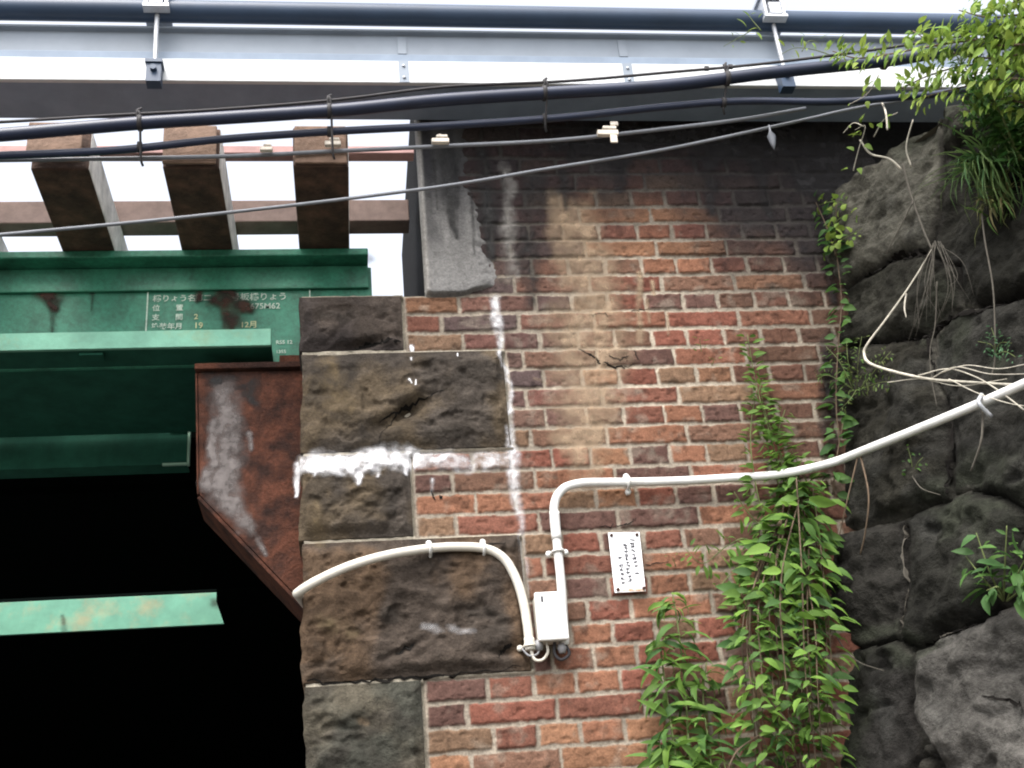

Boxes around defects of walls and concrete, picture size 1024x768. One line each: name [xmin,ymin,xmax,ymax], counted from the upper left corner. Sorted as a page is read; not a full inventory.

corrosion [36,293,61,311]
corrosion [196,290,254,329]
crack [580,349,639,369]
crack [379,388,447,443]
damp [295,448,454,497]